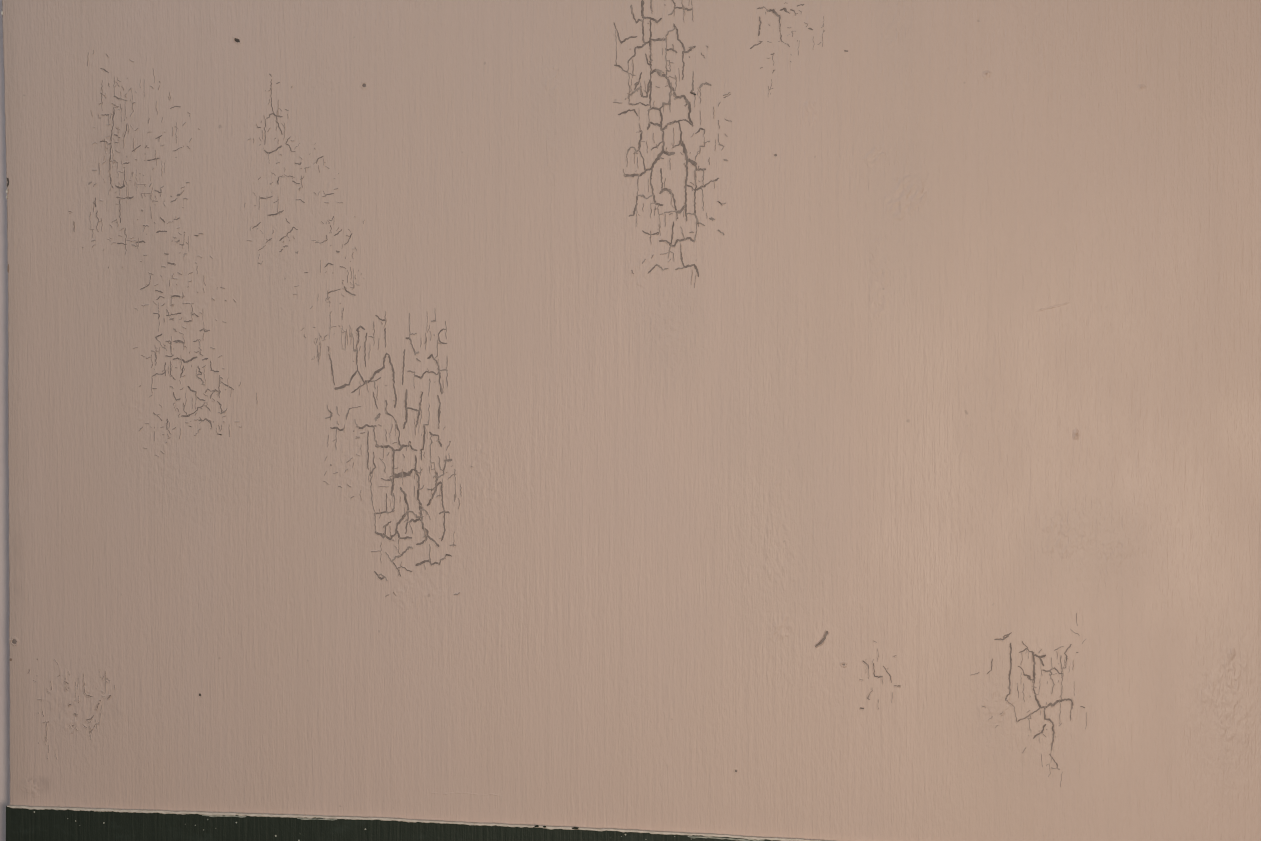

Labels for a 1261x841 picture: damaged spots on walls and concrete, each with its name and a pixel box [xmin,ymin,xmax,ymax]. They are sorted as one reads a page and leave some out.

crack [68,50,259,458]
crack [244,73,473,598]
crack [612,0,733,288]
crack [749,1,849,97]
crack [970,613,1088,787]